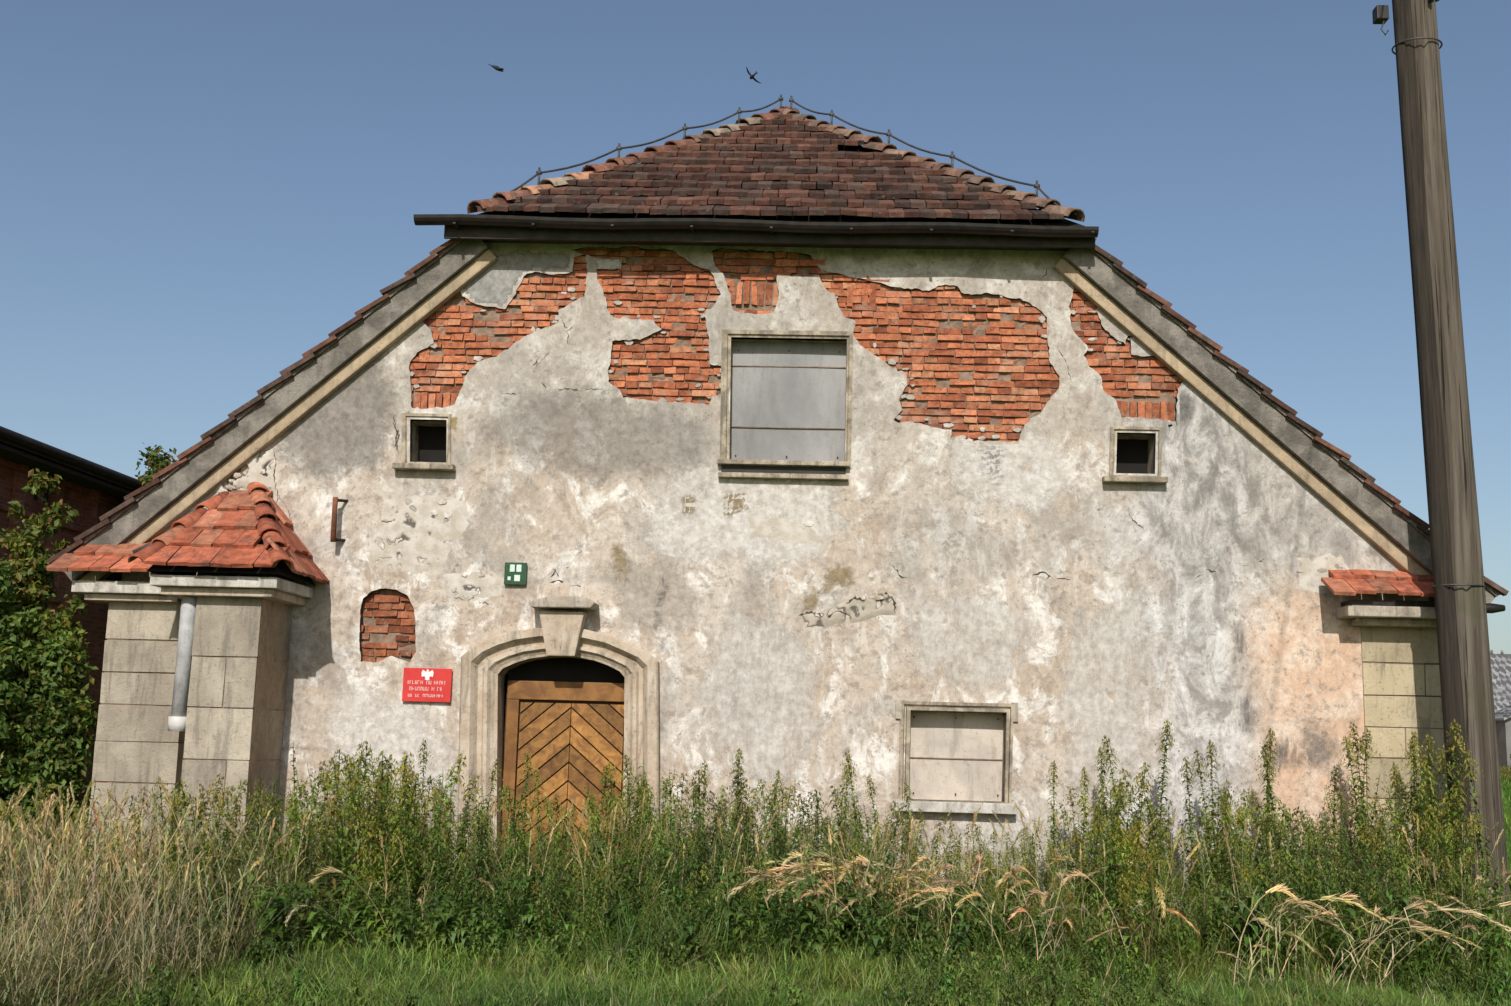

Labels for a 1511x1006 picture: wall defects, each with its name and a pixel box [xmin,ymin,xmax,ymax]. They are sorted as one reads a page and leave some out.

flaking render [410,247,1059,442]
flaking render [1069,287,1183,427]
spalling [797,590,898,633]